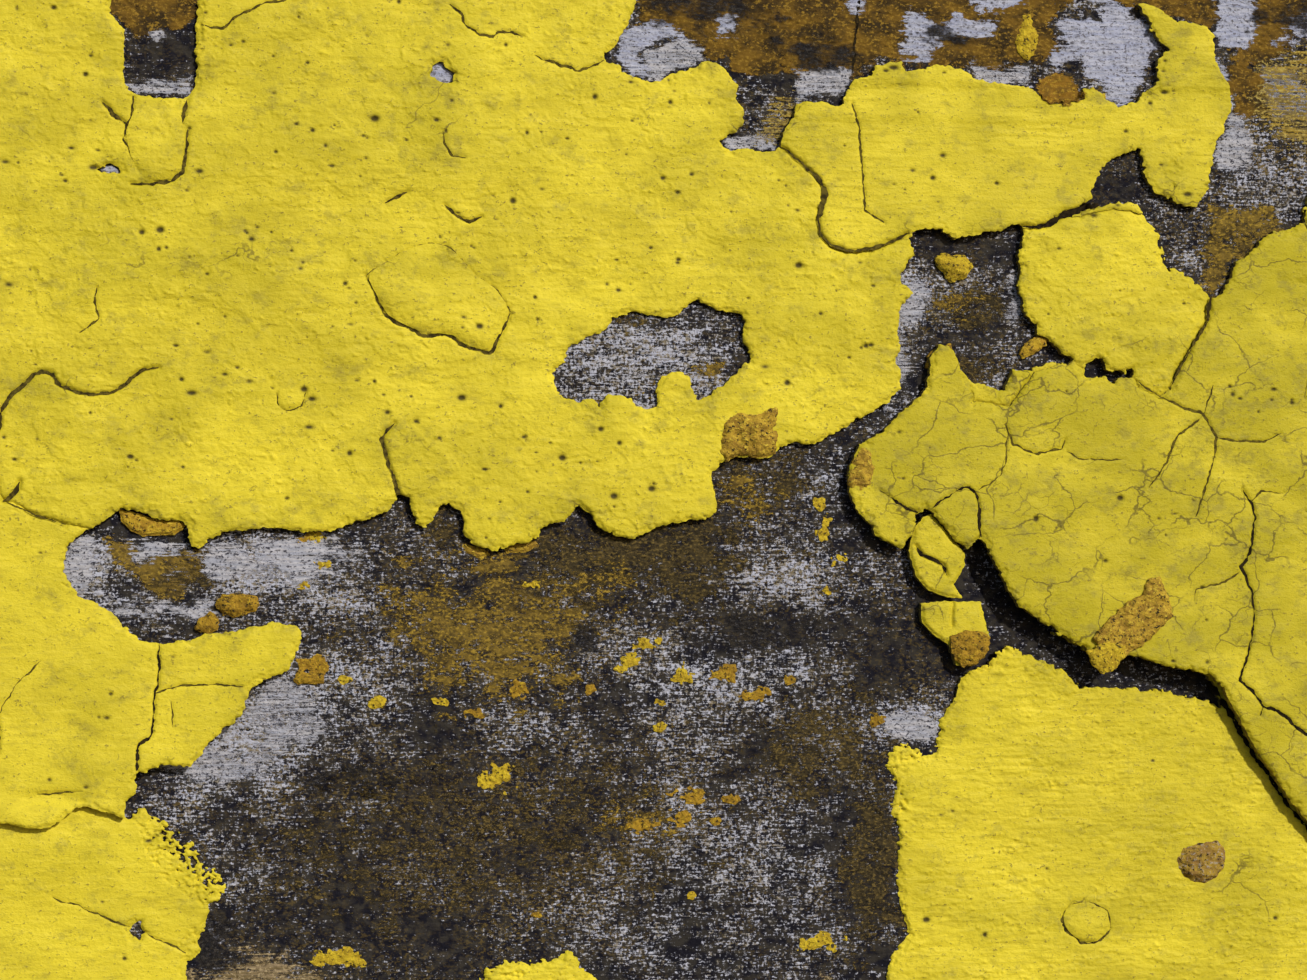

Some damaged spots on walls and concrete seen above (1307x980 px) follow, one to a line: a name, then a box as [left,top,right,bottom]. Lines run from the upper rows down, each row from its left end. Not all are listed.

flaking render [110,3,198,99]
peeling [604,0,1307,473]
crack [1023,203,1099,229]
crack [0,367,159,430]
flaking render [552,300,750,409]
crack [1138,297,1282,516]
crack [880,425,1307,831]
crack [135,643,243,771]
flaking render [0,420,989,980]